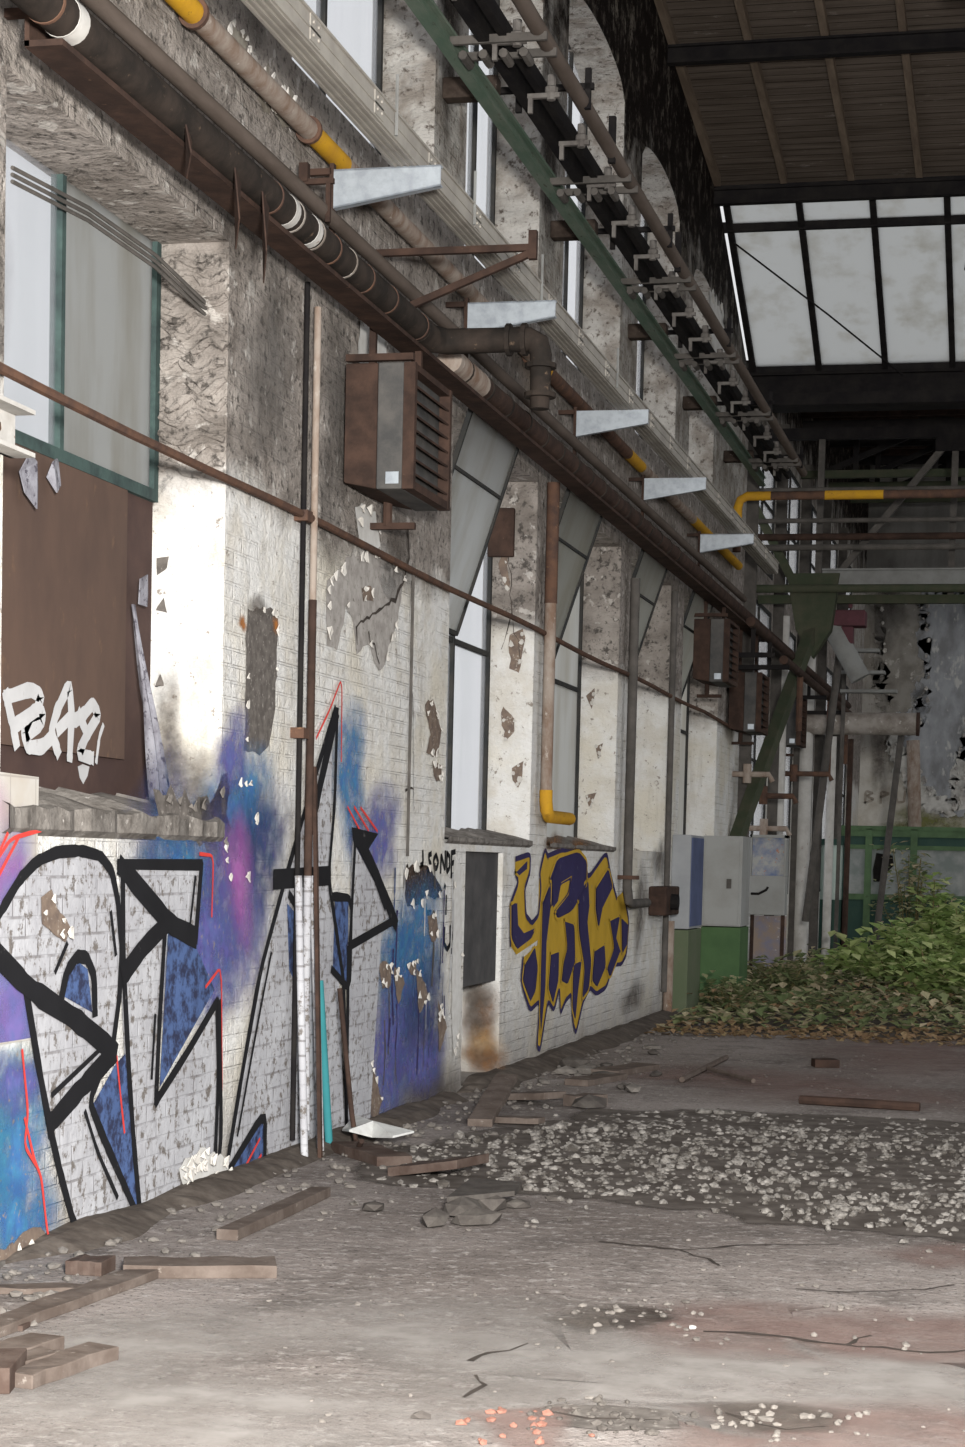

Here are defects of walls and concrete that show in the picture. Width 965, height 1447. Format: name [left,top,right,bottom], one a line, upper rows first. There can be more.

peeling [326,503,407,670]
flaking render [244,606,280,755]
peeling [868,592,965,818]
peeling [41,889,74,942]